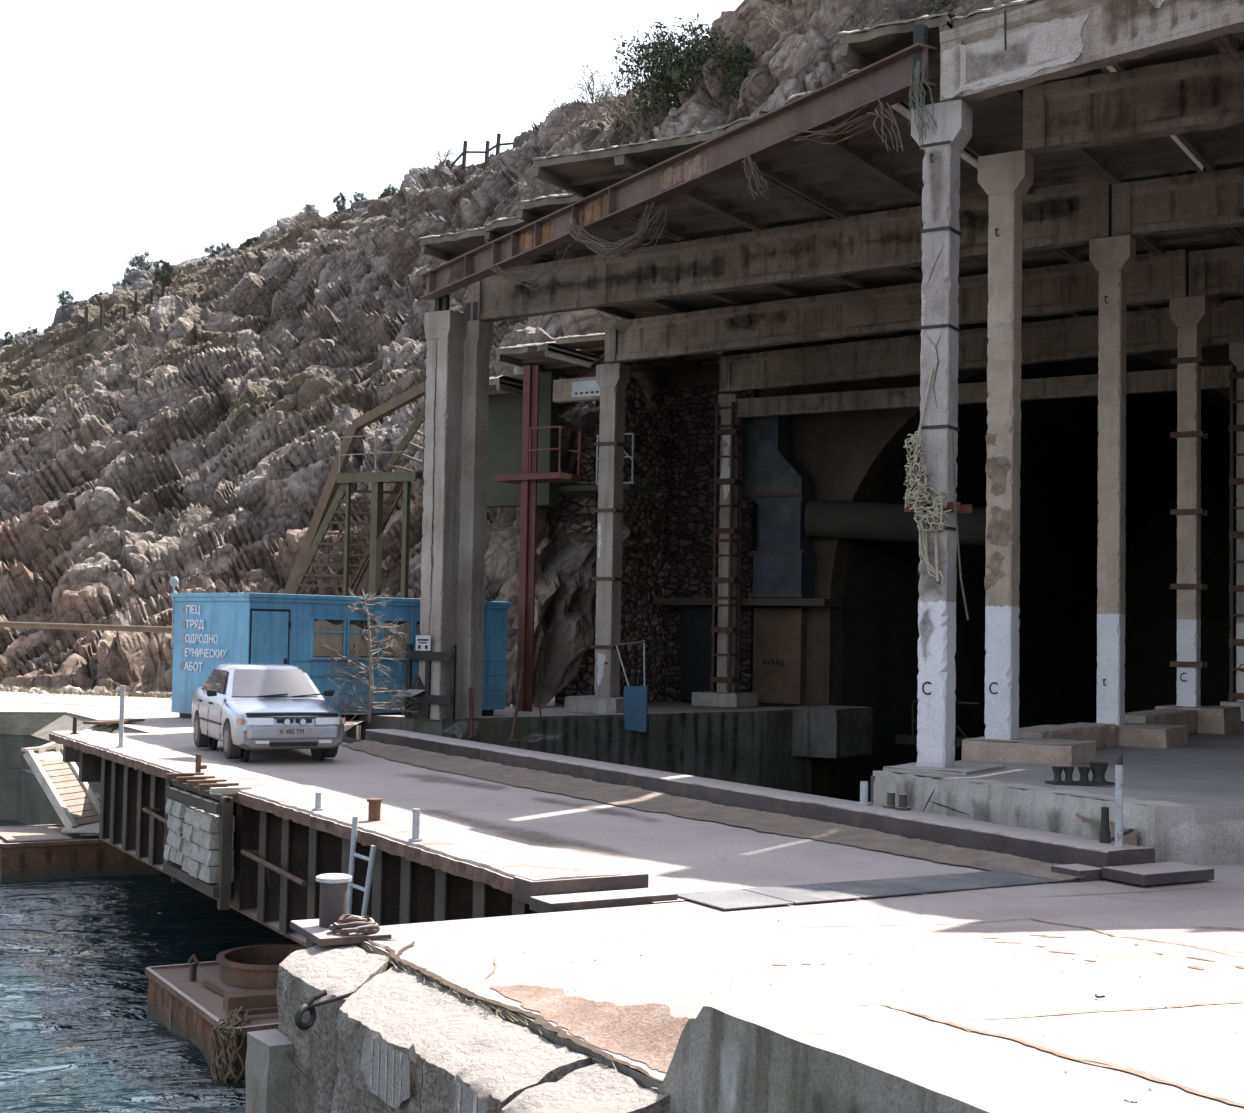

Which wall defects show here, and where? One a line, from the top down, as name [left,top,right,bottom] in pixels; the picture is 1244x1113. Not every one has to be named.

corrosion [520,224,553,250]
corrosion [569,197,606,227]
corrosion [660,153,707,189]
peeling [984,433,1011,591]
crack [936,886,1244,956]
crack [368,938,662,1082]
spalling [490,984,694,1073]
crack [849,1001,1244,1107]